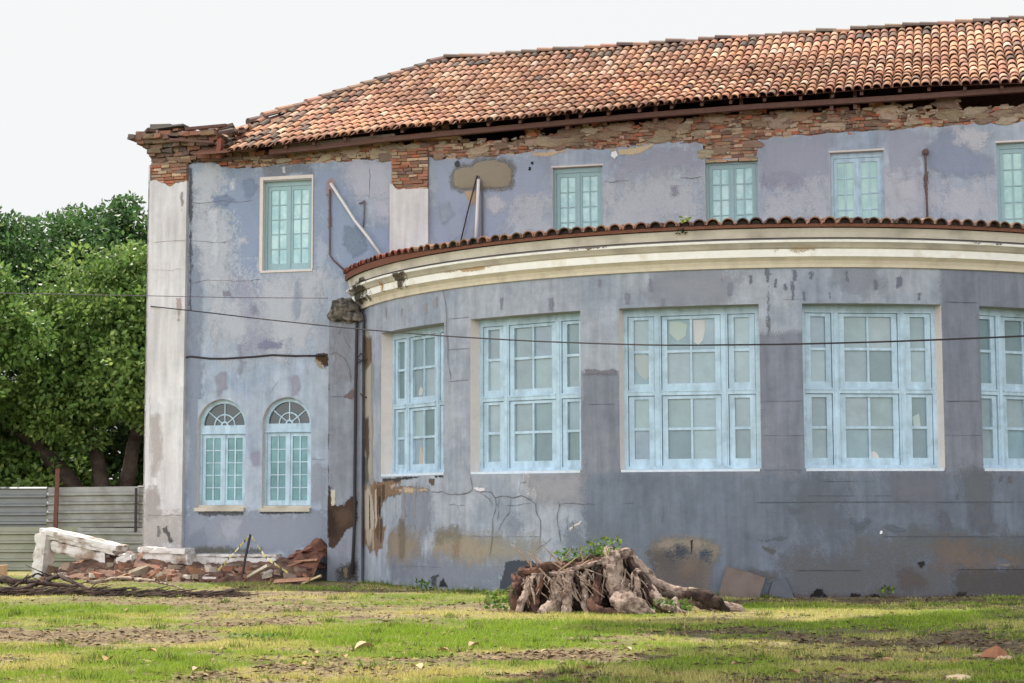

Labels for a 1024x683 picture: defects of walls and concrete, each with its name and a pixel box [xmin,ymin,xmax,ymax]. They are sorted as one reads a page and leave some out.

flaking render [391,148,429,190]
peeling [611,144,654,159]
flaking render [705,130,758,164]
peeling [327,326,443,557]
crack [436,476,595,555]
damp [523,470,722,592]